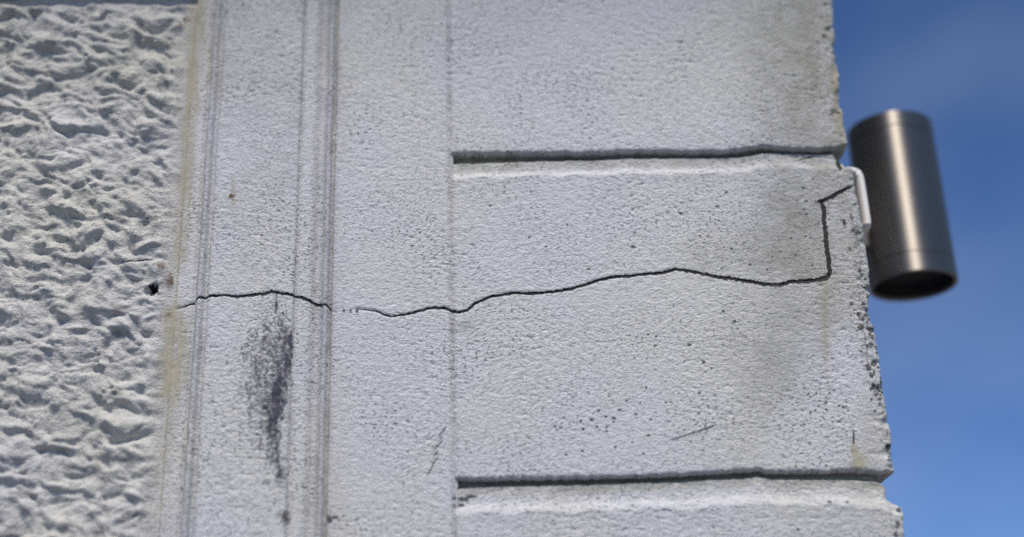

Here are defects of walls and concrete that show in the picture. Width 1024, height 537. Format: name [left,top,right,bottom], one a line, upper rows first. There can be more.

crack [182,156,853,317]
water stain [240,293,293,483]